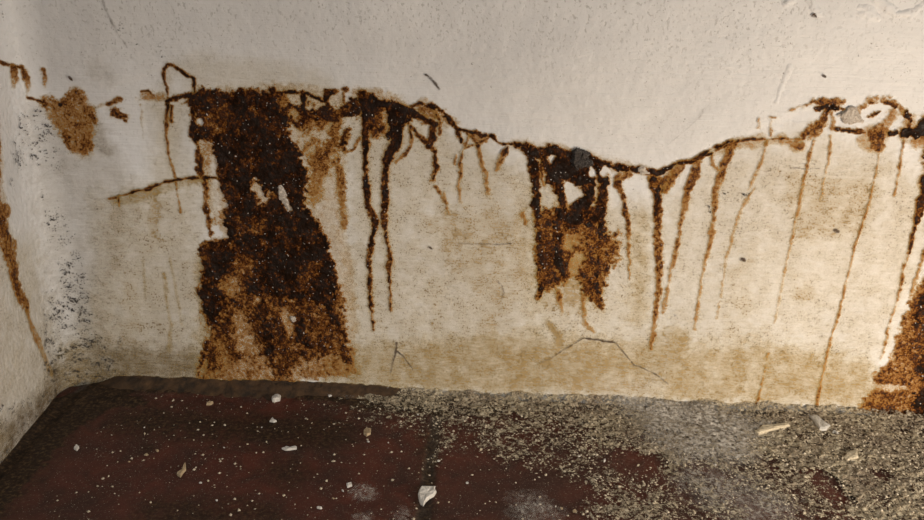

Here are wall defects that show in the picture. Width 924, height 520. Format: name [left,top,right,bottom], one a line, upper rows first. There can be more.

corrosion [0,141,53,374]
corrosion [0,60,128,156]
leakage [0,184,209,464]
corrosion [140,63,924,418]
crack [559,338,657,375]
leakage [328,136,914,408]